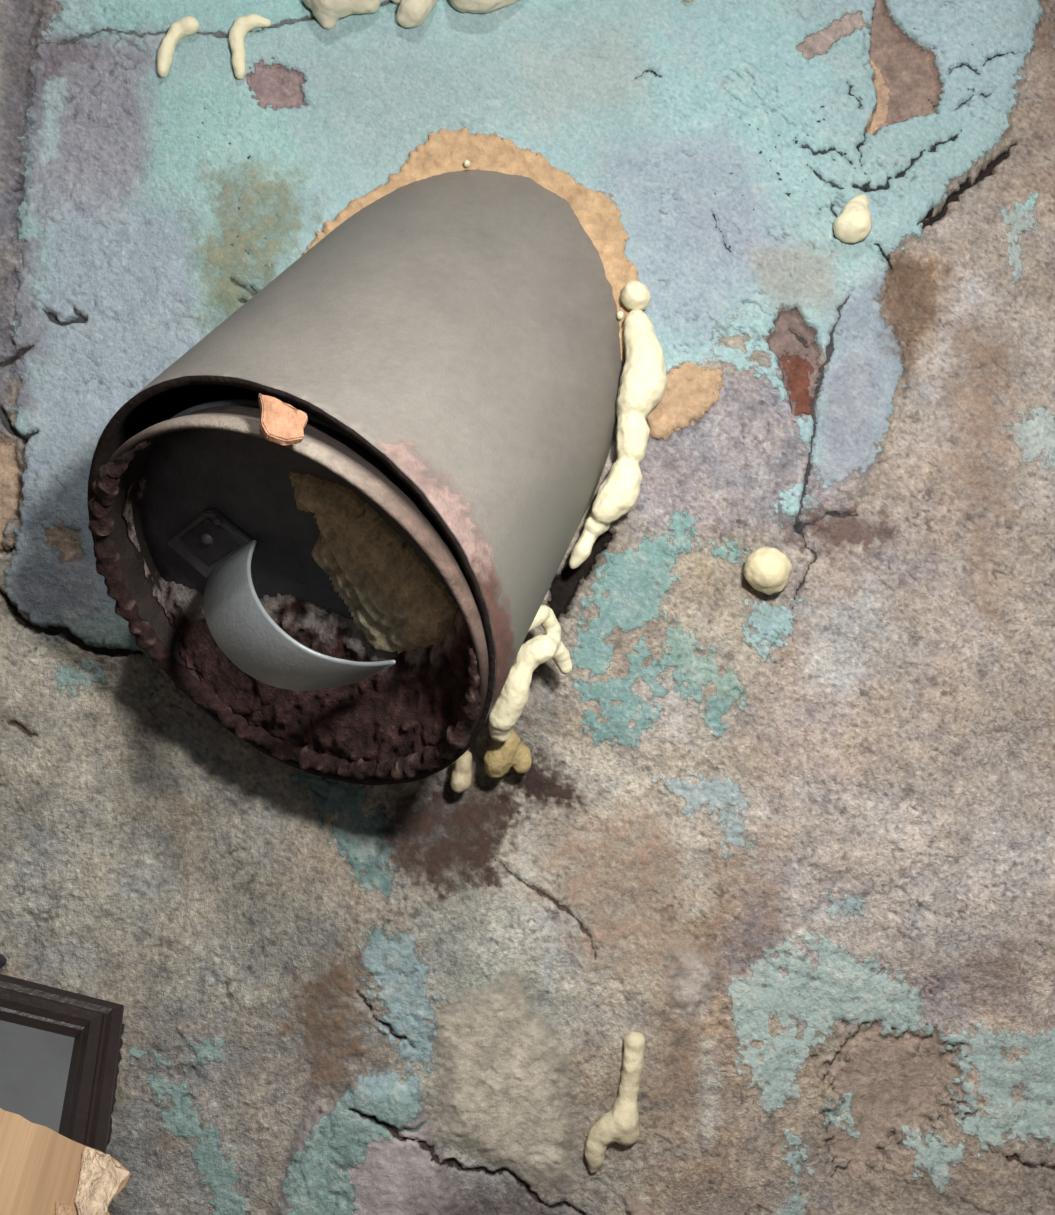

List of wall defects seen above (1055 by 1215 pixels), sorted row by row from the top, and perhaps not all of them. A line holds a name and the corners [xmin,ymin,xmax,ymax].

crack [36,27,168,48]
crack [197,15,316,38]
peeling [0,0,1044,697]
crack [789,295,858,609]
peeling [1003,407,1055,474]
crack [0,590,143,657]
corrosion [378,442,514,708]
peeling [651,769,757,862]
crack [495,860,597,959]
crack [357,990,415,1048]
peeling [727,891,1055,1215]
crack [349,1109,585,1215]